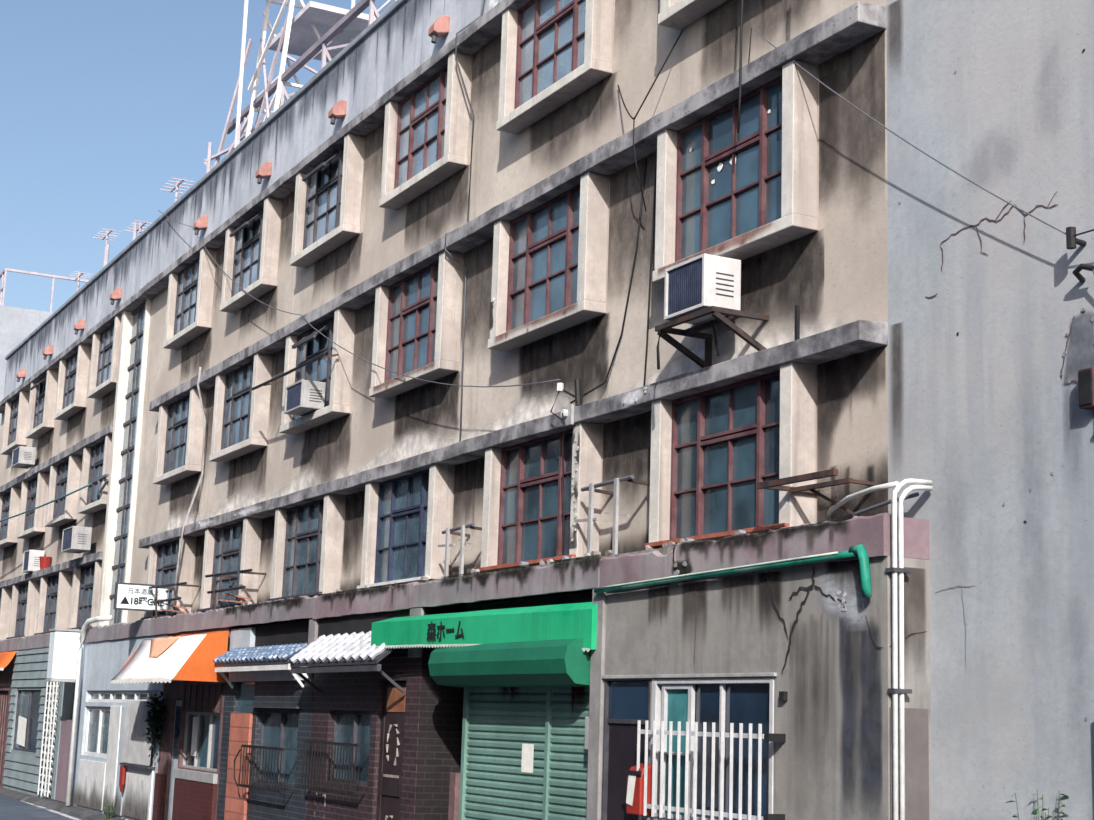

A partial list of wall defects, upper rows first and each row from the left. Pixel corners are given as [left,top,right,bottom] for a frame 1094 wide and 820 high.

damp [819,0,901,196]
damp [10,39,364,365]
damp [460,237,494,339]
damp [608,151,657,271]
crack [925,193,1059,299]
spalling [1061,308,1094,385]
damp [163,300,608,532]
damp [602,411,651,489]
damp [260,515,275,558]
damp [343,490,365,567]
crack [767,566,927,674]
damp [840,616,882,795]